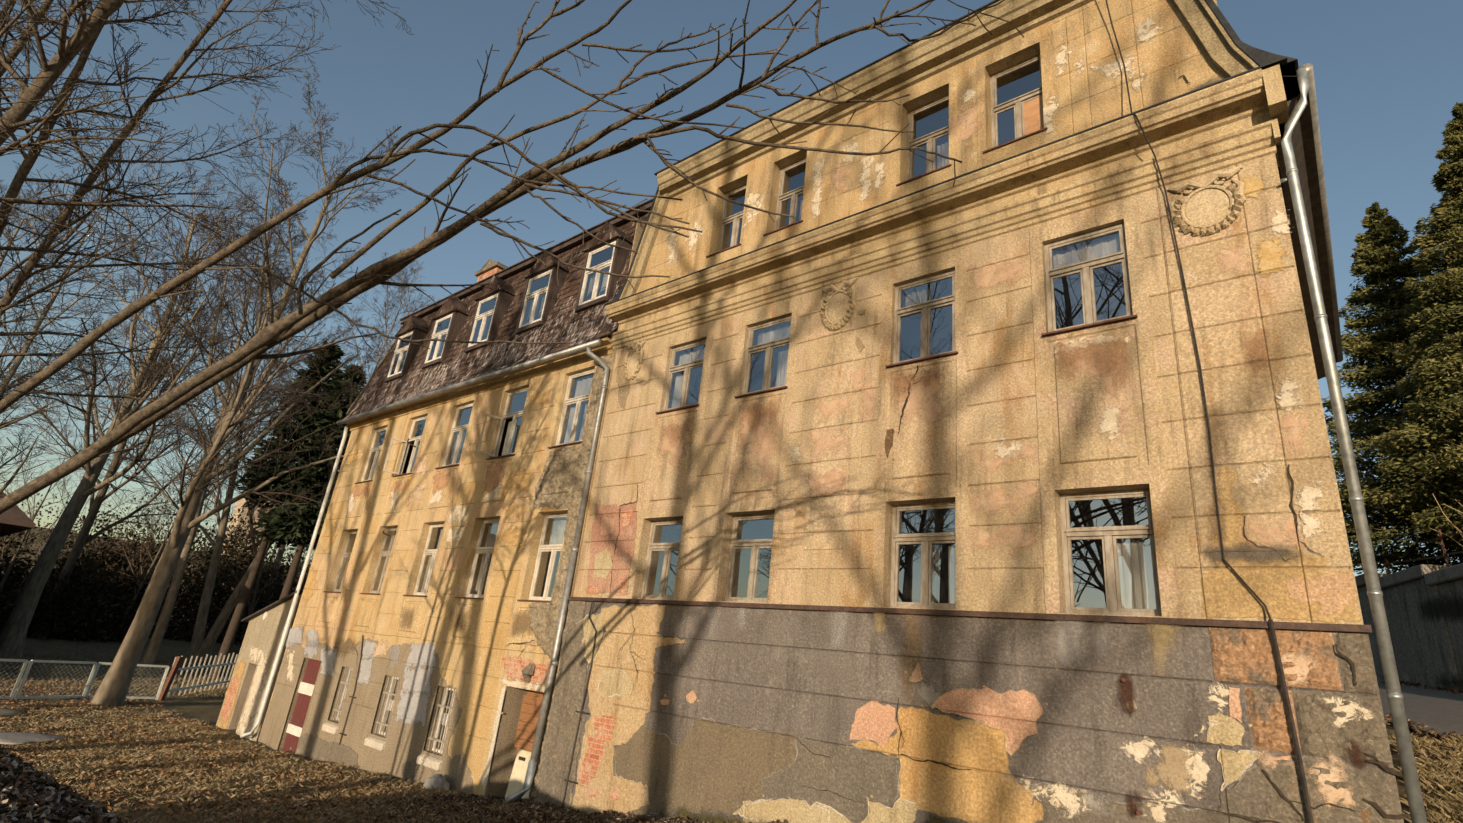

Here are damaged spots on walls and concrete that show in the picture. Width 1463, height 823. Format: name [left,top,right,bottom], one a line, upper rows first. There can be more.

flaking render [811,137,886,219]
flaking render [1218,209,1291,277]
crack [898,365,921,433]
flaking render [217,333,1374,823]
rust [1119,674,1137,714]